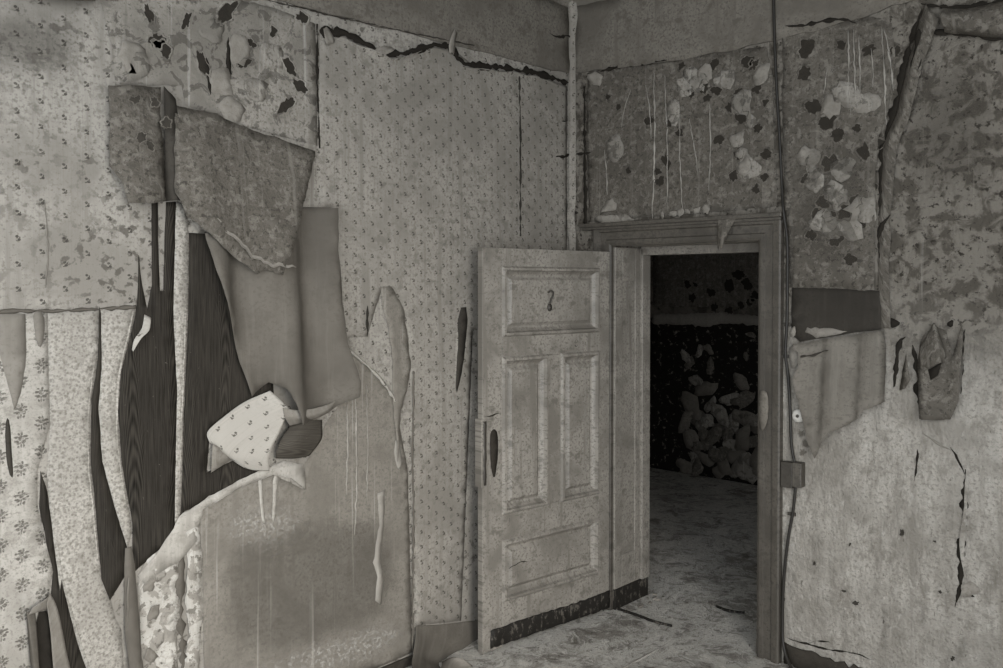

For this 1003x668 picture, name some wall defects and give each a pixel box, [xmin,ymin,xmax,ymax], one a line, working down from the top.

flaking render [100,0,569,148]
peeling [586,17,903,484]
flaking render [138,348,415,668]
crack [914,433,981,606]